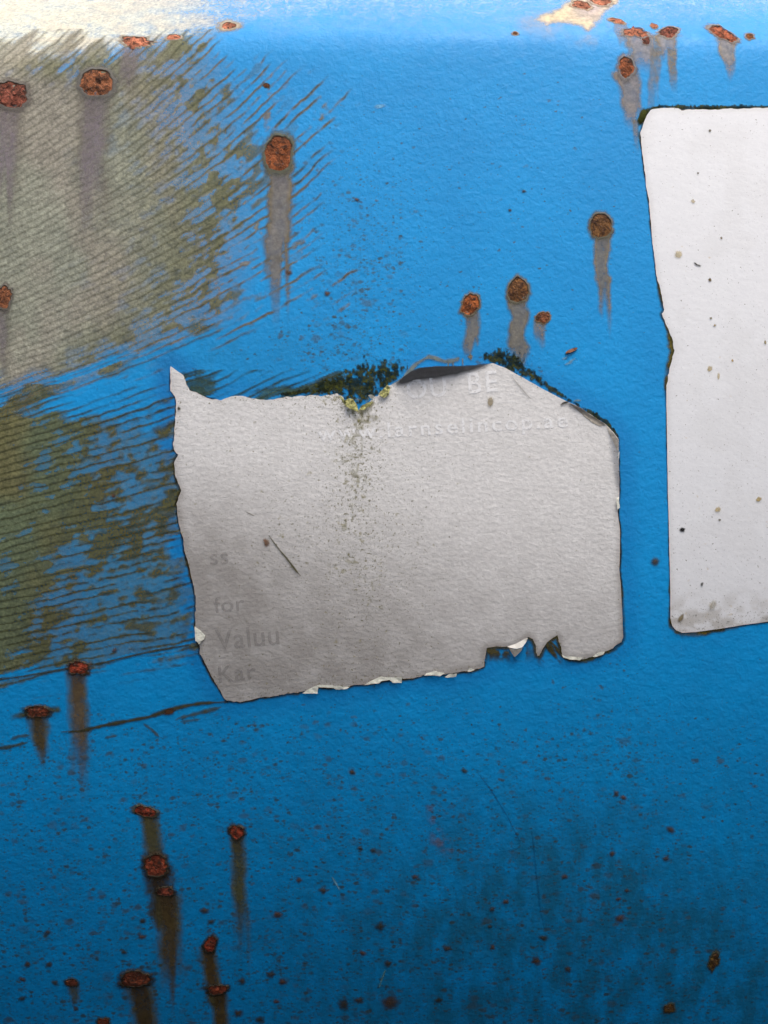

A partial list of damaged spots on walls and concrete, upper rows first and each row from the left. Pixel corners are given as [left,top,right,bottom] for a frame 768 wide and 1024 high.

rust [705,24,755,70]
rust [0,77,32,197]
rust [76,34,183,191]
rust [261,131,295,287]
rust [588,211,614,310]
rust [459,292,481,351]
rust [506,274,551,360]
rust [16,659,92,758]
rust [117,803,181,1024]
rust [227,824,246,926]
rust [201,934,230,1024]